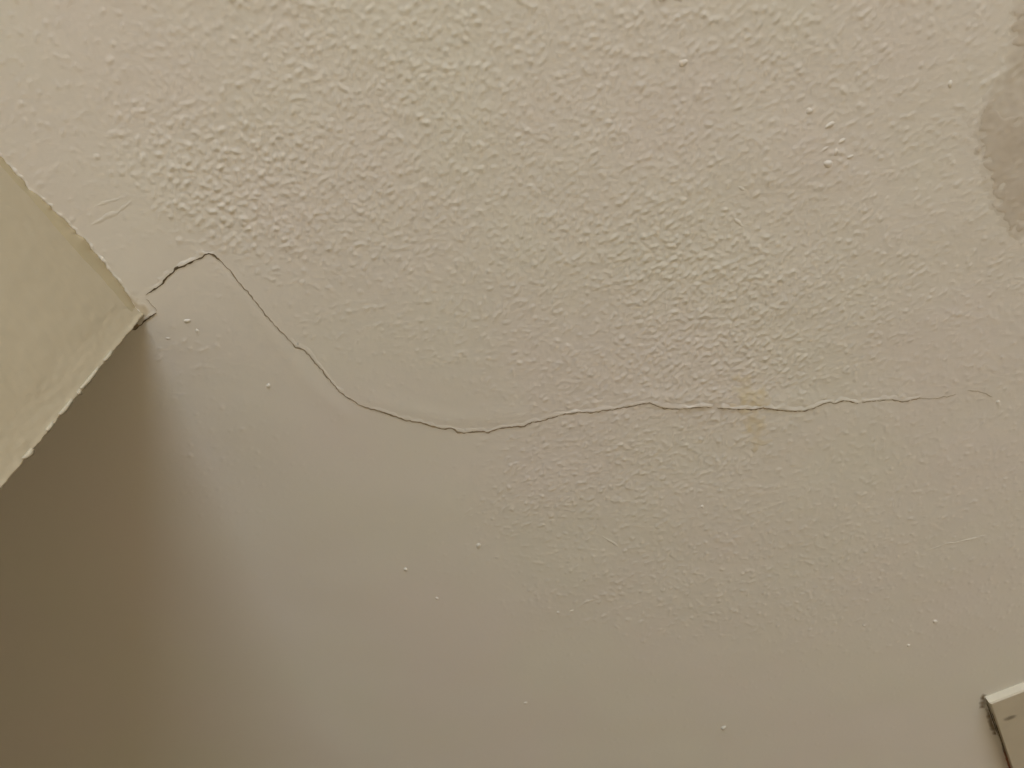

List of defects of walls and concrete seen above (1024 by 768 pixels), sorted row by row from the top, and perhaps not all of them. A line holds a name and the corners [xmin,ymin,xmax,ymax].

water stain [966,0,1024,245]
crack [135,251,992,434]